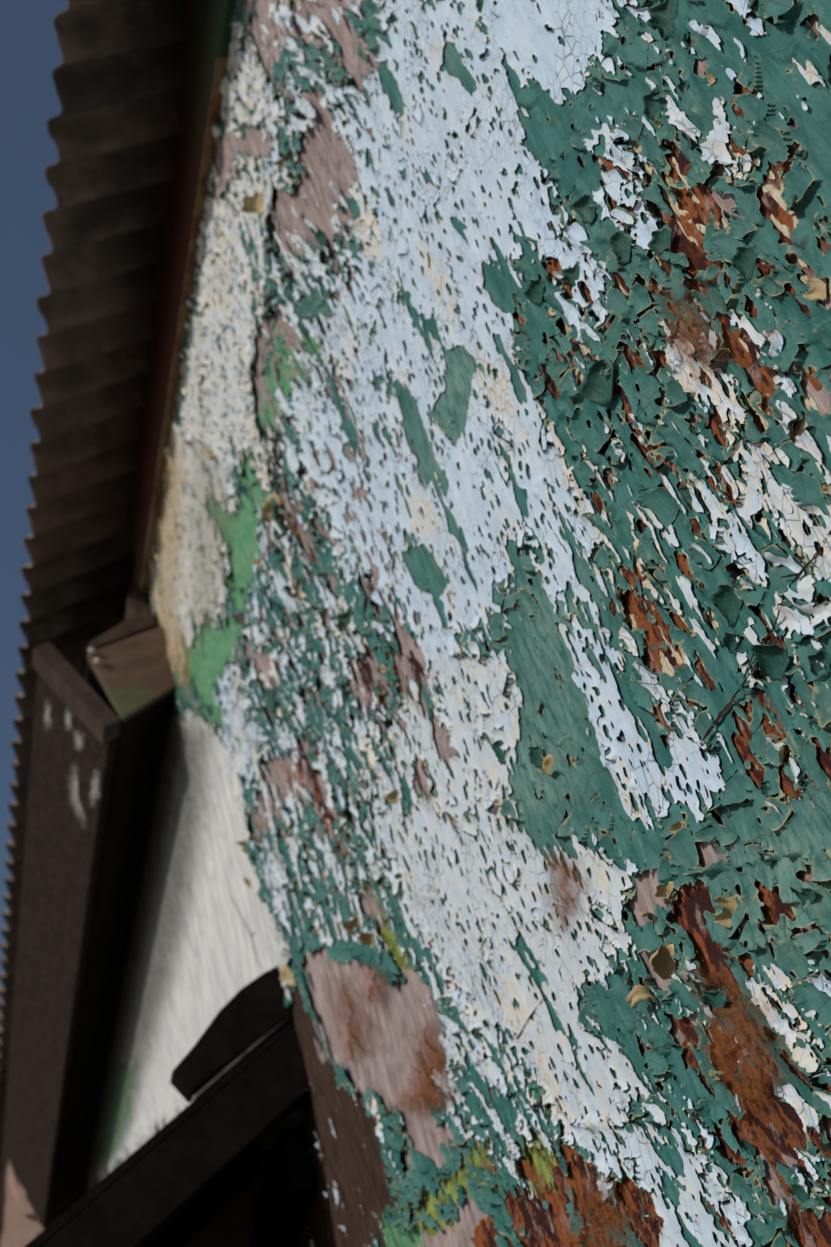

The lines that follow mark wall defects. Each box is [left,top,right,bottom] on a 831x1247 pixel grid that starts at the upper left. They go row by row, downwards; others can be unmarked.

peeling [617,0,678,54]
peeling [683,15,721,51]
peeling [725,0,766,62]
peeling [792,58,831,87]
peeling [624,65,798,246]
peeling [565,411,625,500]
peeling [639,295,831,706]
peeling [622,485,720,659]
peeling [737,652,808,718]
peeling [745,960,831,1077]
peeling [414,1185,500,1247]
peeling [752,1148,828,1236]